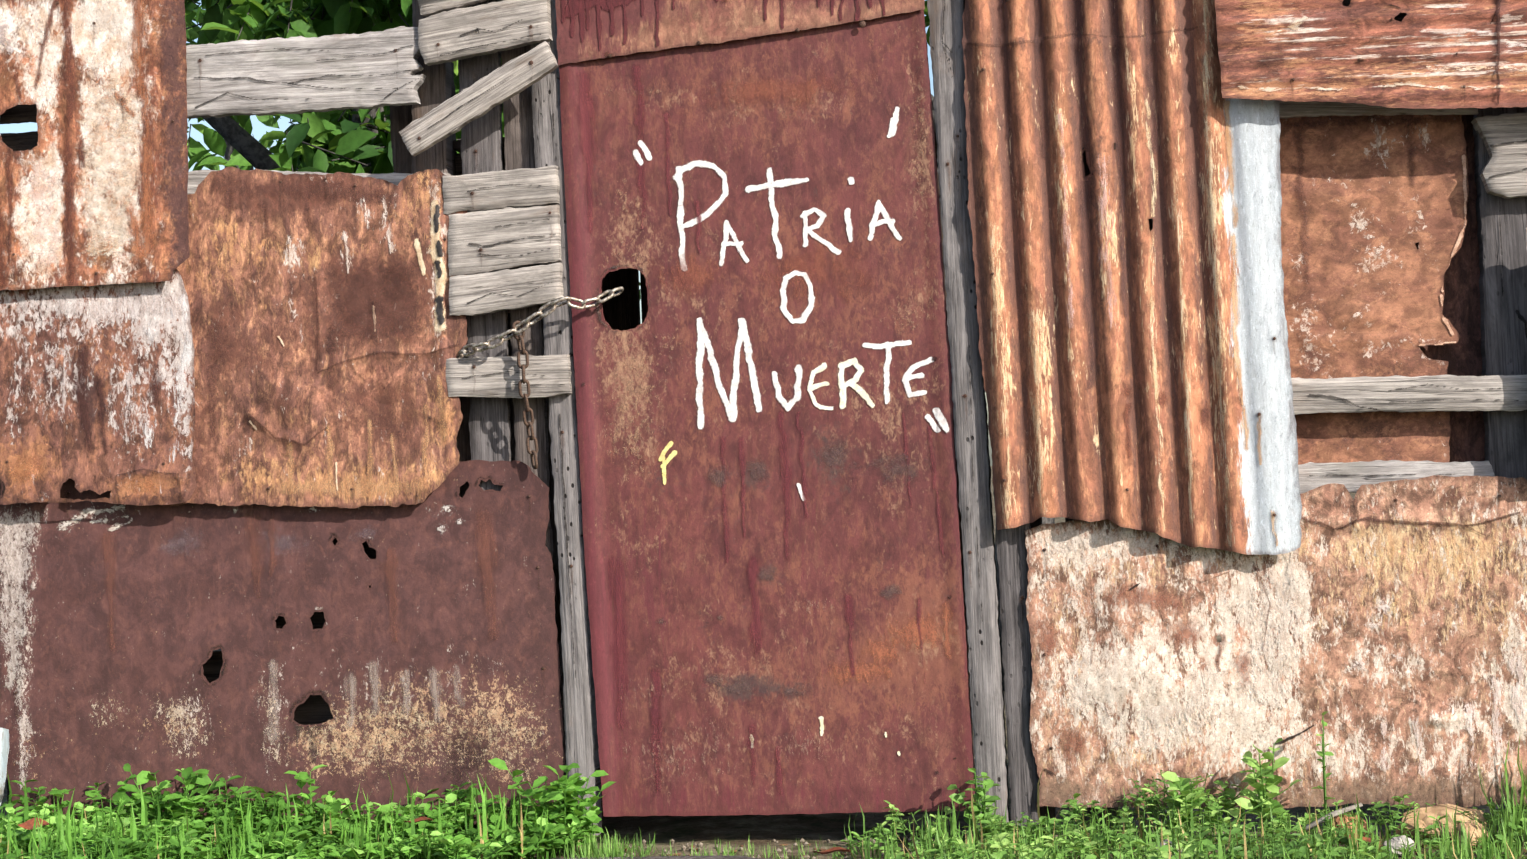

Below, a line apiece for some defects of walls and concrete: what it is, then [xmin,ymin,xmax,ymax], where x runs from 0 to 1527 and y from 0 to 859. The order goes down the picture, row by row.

rust [0,156,13,285]
rust [14,0,88,283]
rust [76,344,108,453]
rust [115,0,154,256]
rust [327,263,418,389]
rust [1070,0,1090,157]
rust [1080,177,1097,388]
rust [1109,0,1128,317]
rust [1145,0,1159,153]
rust [1223,99,1262,465]
rust [1343,528,1526,641]
rust [155,695,212,759]